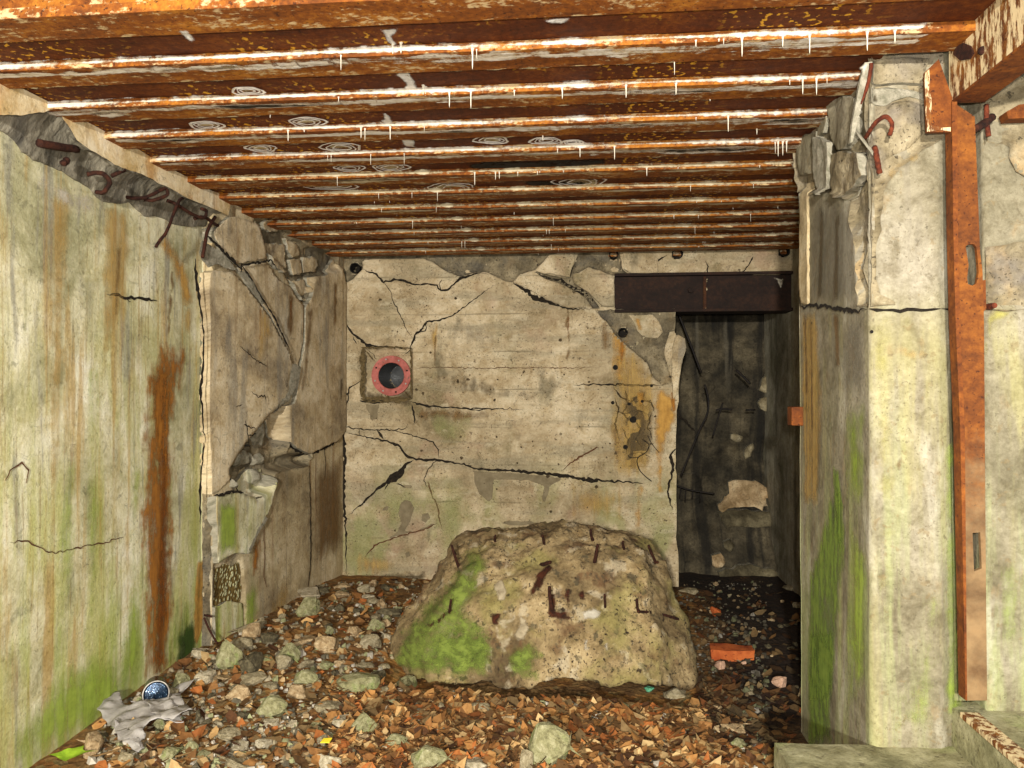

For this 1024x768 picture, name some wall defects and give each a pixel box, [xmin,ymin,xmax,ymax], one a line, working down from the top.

spalling [126,187,217,258]
corrosion [232,87,266,95]
water stain [0,23,928,258]
corrosion [860,63,873,104]
spalling [793,52,951,307]
crack [108,293,157,302]
spalling [254,219,672,468]
crack [798,291,948,314]
spalling [229,364,313,499]
crack [236,265,696,585]
corrosion [141,347,185,672]
water stain [809,635,832,700]